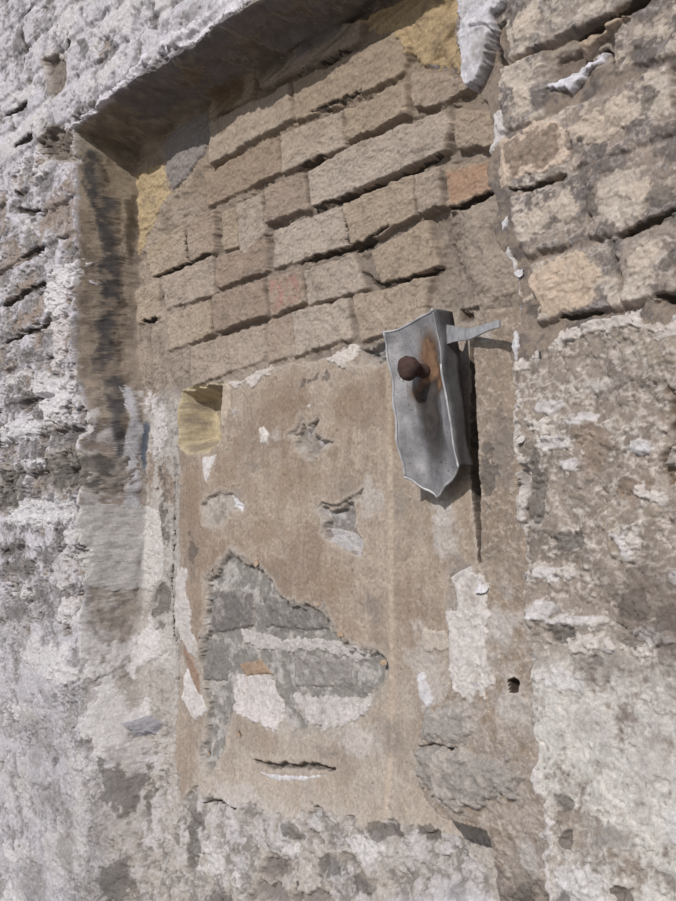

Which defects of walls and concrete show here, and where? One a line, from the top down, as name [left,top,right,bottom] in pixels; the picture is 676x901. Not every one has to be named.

flaking render [220,364,275,427]
corrosion [413,333,443,459]
flaking render [259,426,269,443]
spalling [286,404,339,460]
flaking render [202,454,217,482]
flaking render [0,444,164,592]
spalling [199,489,245,530]
spalling [315,487,364,558]
flaking render [174,545,390,779]
crack [255,759,336,781]